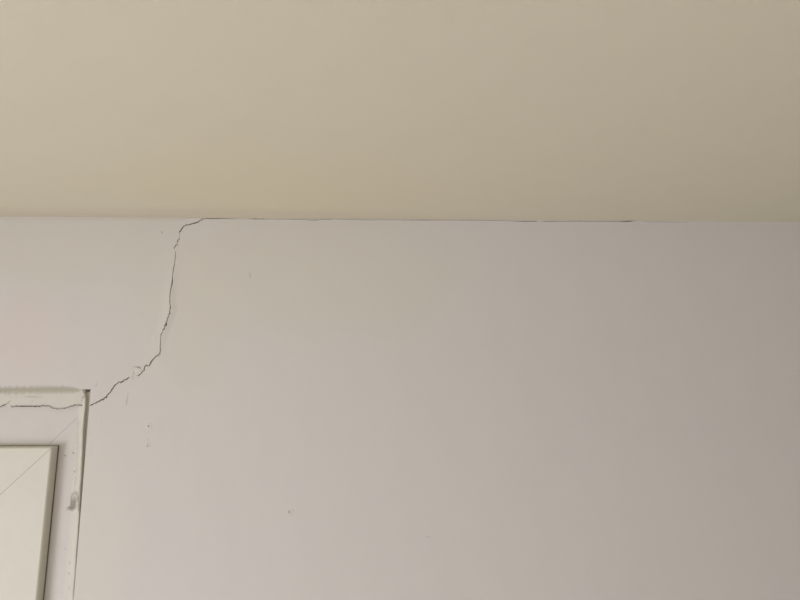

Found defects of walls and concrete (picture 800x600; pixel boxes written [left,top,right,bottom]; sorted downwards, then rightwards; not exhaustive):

crack [0,218,687,410]